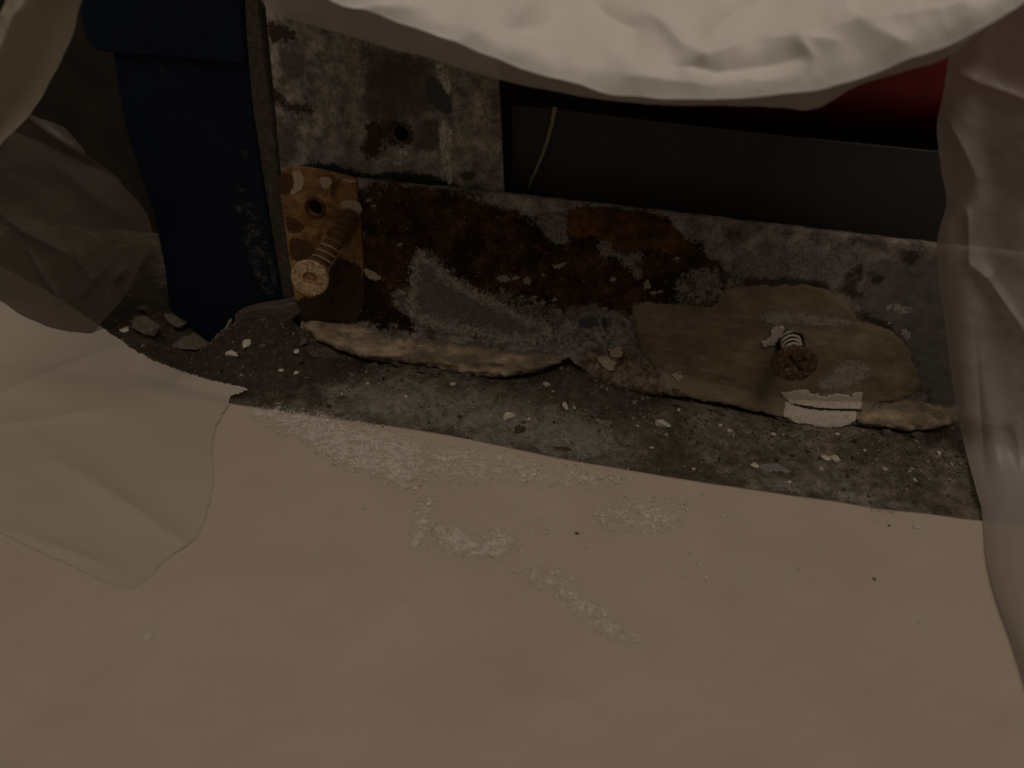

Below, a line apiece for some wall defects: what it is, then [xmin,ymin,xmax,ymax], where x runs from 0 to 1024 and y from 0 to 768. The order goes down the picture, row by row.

corrosion [286,216,315,261]
corrosion [293,176,955,404]
peeling [633,283,919,428]